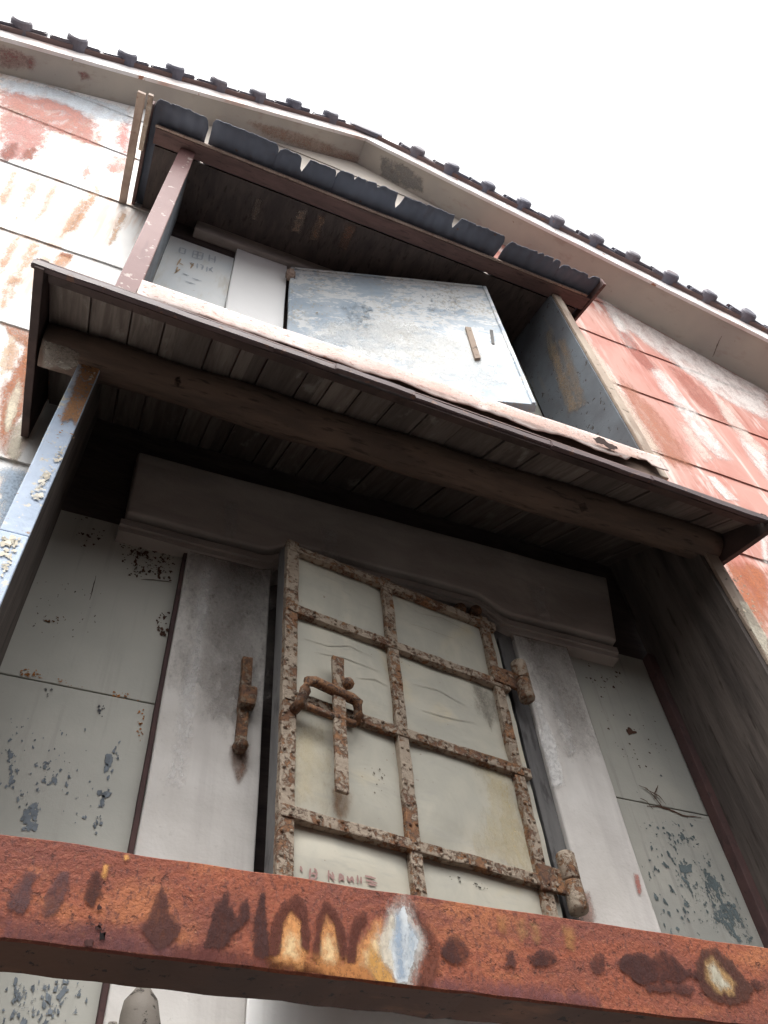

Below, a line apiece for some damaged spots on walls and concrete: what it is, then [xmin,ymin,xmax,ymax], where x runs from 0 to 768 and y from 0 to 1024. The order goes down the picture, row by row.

rust [0,91,100,200]
rust [63,167,99,233]
rust [588,342,690,466]
peeling [0,446,67,577]
peeling [120,544,175,582]
rust [728,562,768,632]
peeling [0,718,121,834]
crack [639,785,701,818]
peeling [646,822,752,944]
peeling [2,977,88,1024]
rust [71,894,385,982]
rust [617,948,764,1005]